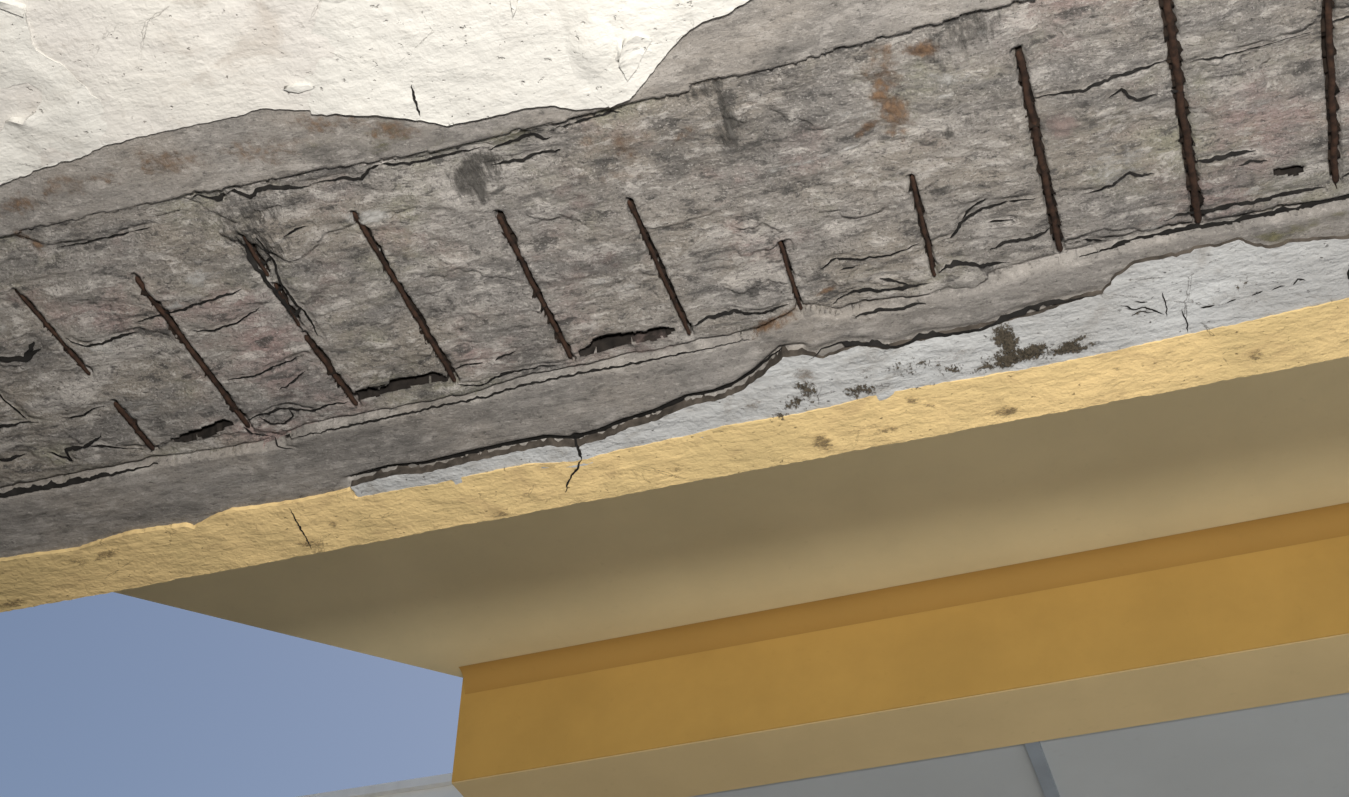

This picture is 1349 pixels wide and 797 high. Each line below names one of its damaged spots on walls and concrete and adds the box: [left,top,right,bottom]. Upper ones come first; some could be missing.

crack [187,110,620,201]
corrosion [1015,46,1064,252]
corrosion [1159,0,1205,223]
crack [1194,150,1266,166]
corrosion [1321,0,1341,189]
corrosion [351,210,458,382]
corrosion [626,197,692,335]
spalling [0,0,1349,497]
crack [0,171,1349,498]
leakage [770,373,818,421]
leakage [844,371,876,399]
leakage [888,312,1099,389]